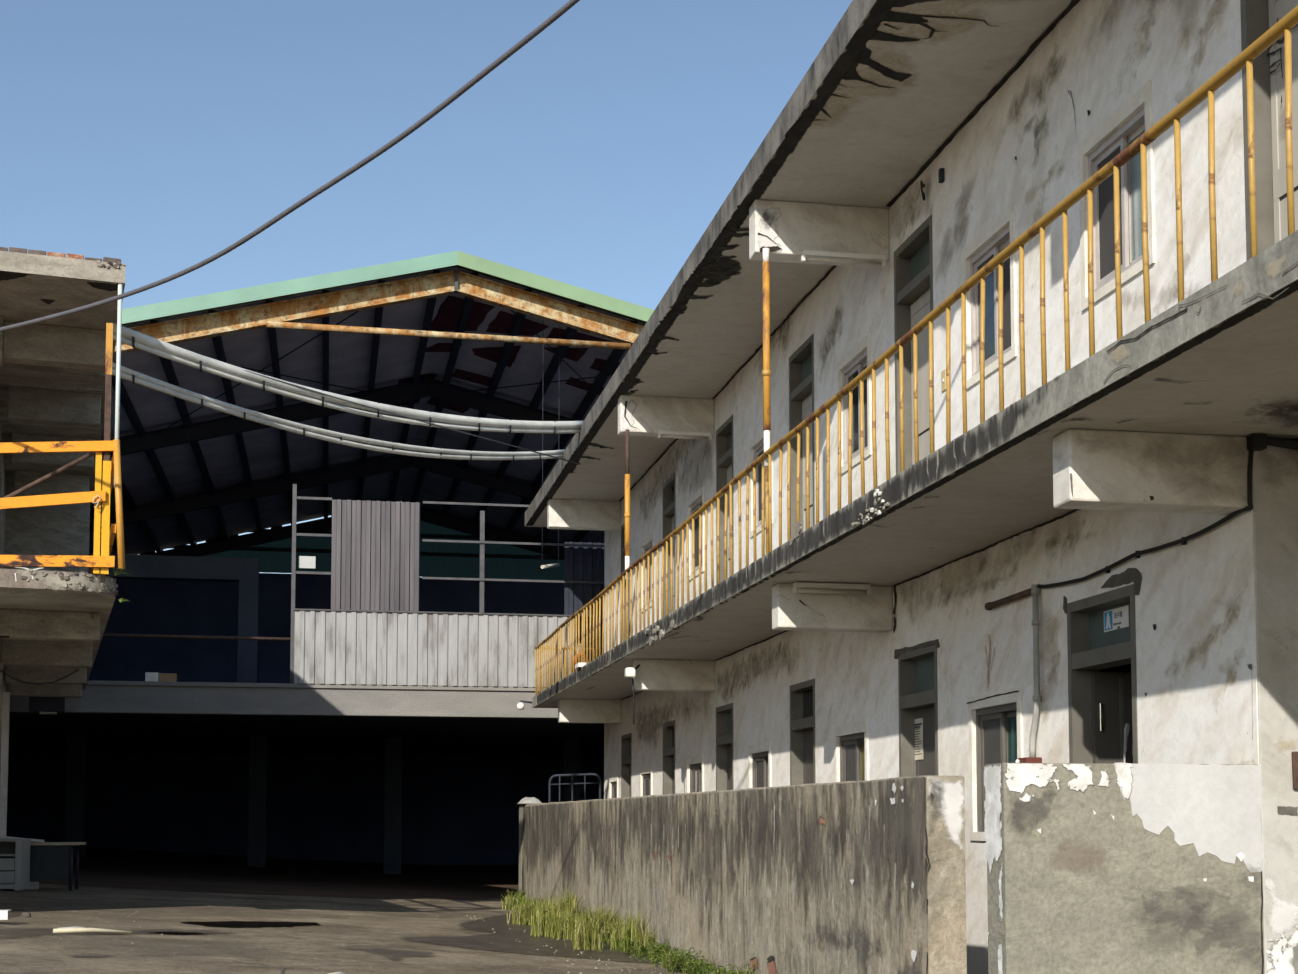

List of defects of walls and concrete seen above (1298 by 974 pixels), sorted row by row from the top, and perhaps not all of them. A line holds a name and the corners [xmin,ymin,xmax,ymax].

water stain [526,0,989,526]
water stain [533,281,1298,708]
water stain [347,912,661,963]
water stain [522,777,964,930]
peeling [984,763,1298,974]